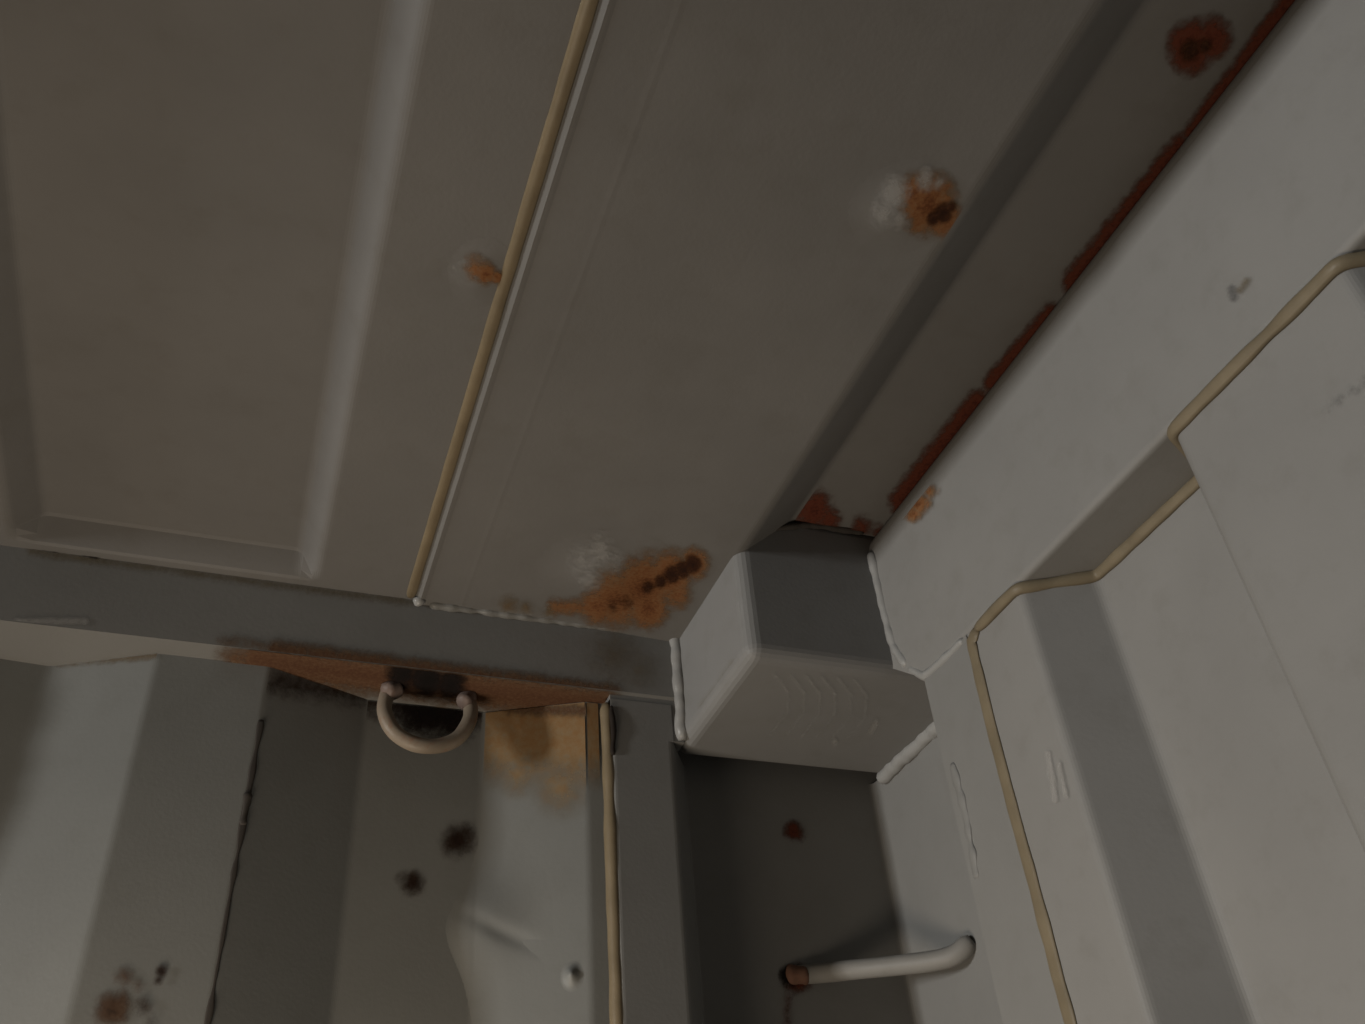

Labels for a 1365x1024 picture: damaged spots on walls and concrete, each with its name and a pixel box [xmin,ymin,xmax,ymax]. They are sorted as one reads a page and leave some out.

rust [1062,0,1295,292]
rust [879,171,960,237]
rust [466,255,502,285]
rust [889,304,1056,523]
rust [796,493,881,536]
rust [547,547,709,630]
rust [220,638,620,806]
rust [444,828,474,852]
rust [403,873,421,892]
rust [779,966,811,1022]